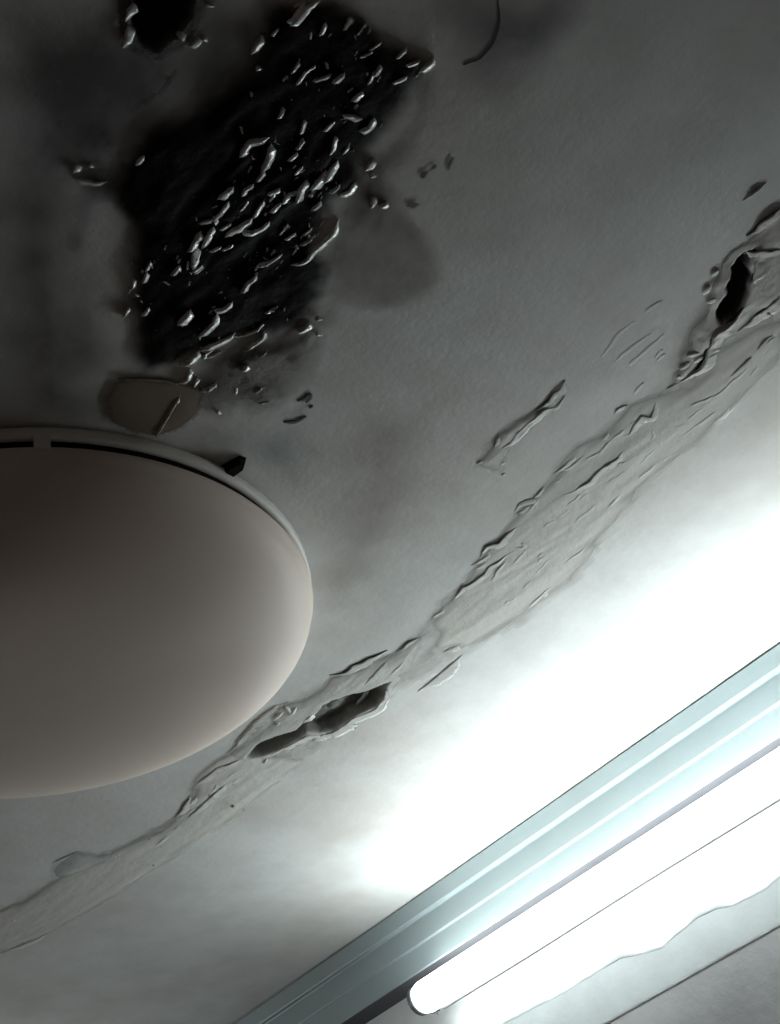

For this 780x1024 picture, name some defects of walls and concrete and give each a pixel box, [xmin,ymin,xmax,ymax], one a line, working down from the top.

peeling [250,28,279,71]
water stain [72,163,107,187]
mould [117,0,436,405]
peeling [339,183,358,198]
peeling [364,157,377,179]
peeling [368,195,389,210]
spalling [667,207,780,389]
peeling [107,316,323,437]
water stain [284,393,313,424]
spalling [419,645,461,691]
spalling [229,637,420,763]